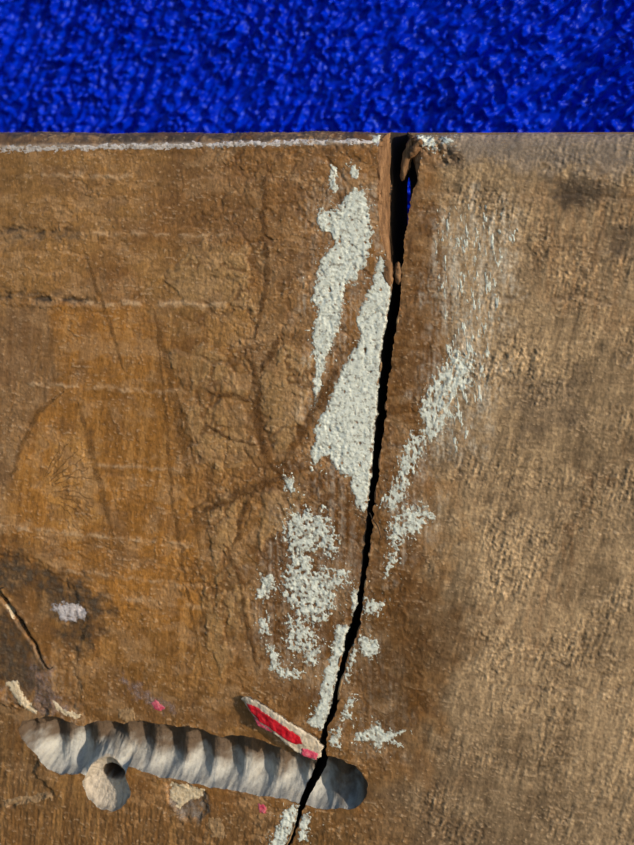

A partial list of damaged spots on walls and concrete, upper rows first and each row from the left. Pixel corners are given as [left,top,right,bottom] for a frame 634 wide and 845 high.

crack [286,132,423,845]
crack [0,587,54,670]
peeling [52,700,83,719]
peeling [169,782,205,809]
peeling [208,817,225,839]
peeling [258,802,312,845]